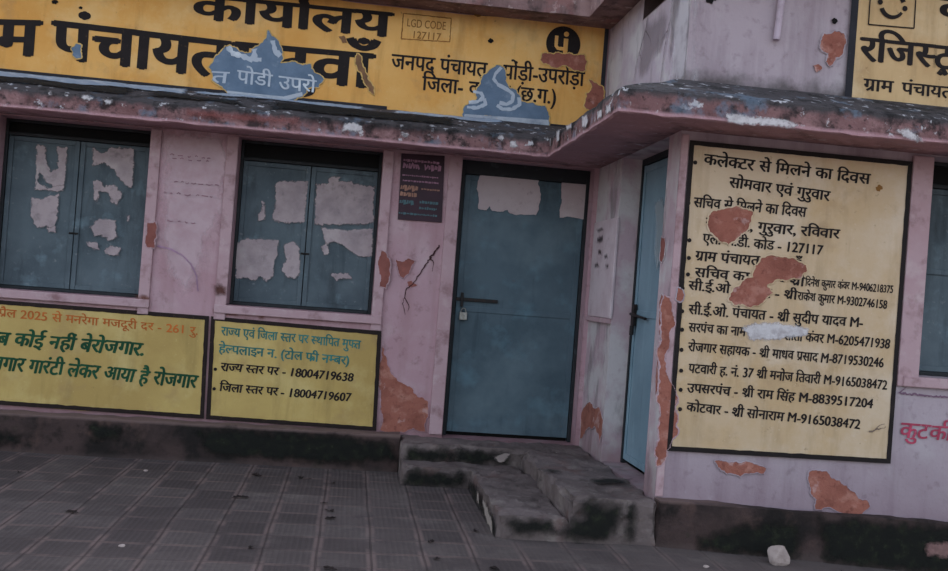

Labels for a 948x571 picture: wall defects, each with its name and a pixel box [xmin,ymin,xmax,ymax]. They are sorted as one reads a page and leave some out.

peeling [207,29,325,100]
peeling [814,18,848,72]
peeling [461,52,611,141]
peeling [706,205,754,246]
peeling [377,249,417,289]
crack [402,245,440,312]
peeling [727,253,808,309]
peeling [379,346,430,434]
peeling [654,287,685,467]
peeling [580,401,604,443]
peeling [714,459,768,478]
peeling [807,469,871,514]